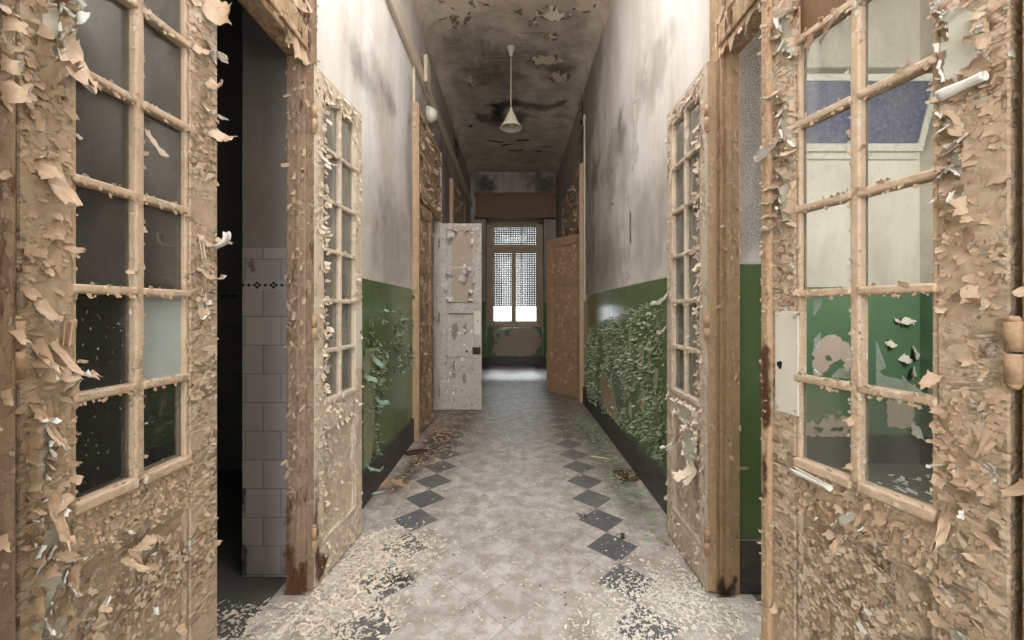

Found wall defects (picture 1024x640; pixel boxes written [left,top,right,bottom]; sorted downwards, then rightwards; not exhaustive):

peeling [269,0,738,637]
damp [476,100,565,125]